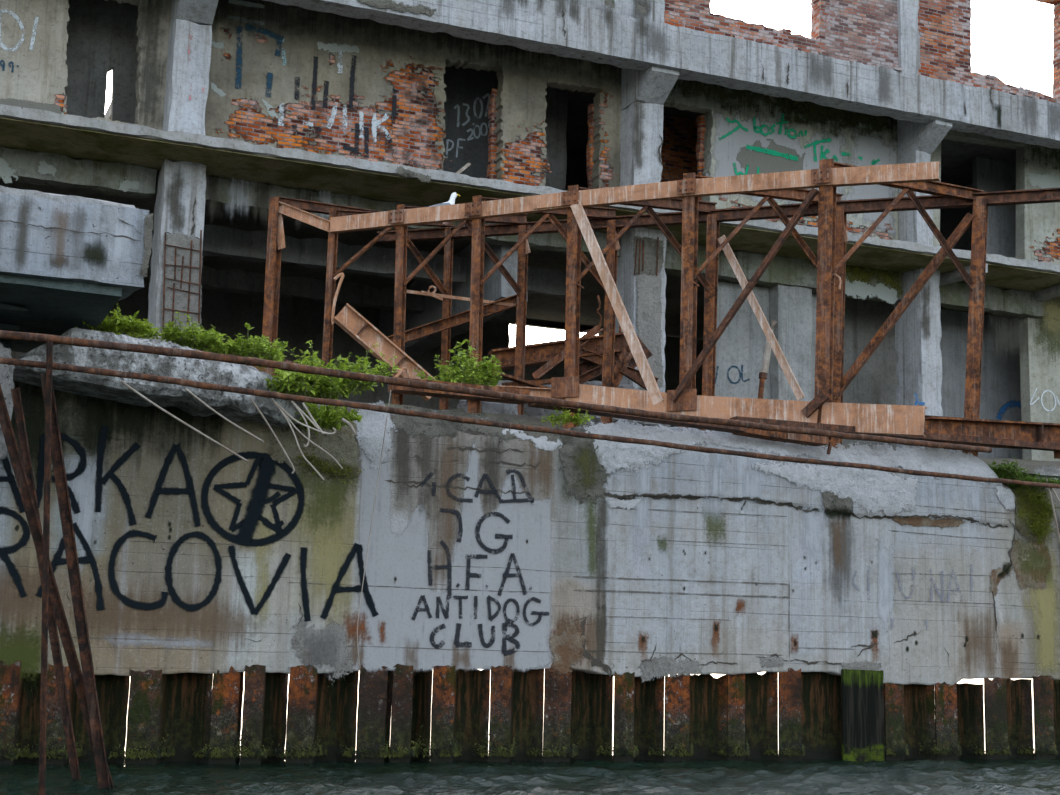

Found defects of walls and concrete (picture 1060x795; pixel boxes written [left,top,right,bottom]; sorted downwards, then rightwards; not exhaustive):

flaking render [210,56,452,183]
flaking render [498,122,552,186]
leakage [16,201,30,265]
leakage [109,223,130,265]
flaking render [1029,229,1060,262]
spalling [185,388,1060,596]
crack [587,492,819,513]
leakage [554,501,607,663]
crack [851,513,1015,649]
leakage [85,595,245,647]
spalling [291,616,357,683]
corrosion [344,616,385,663]